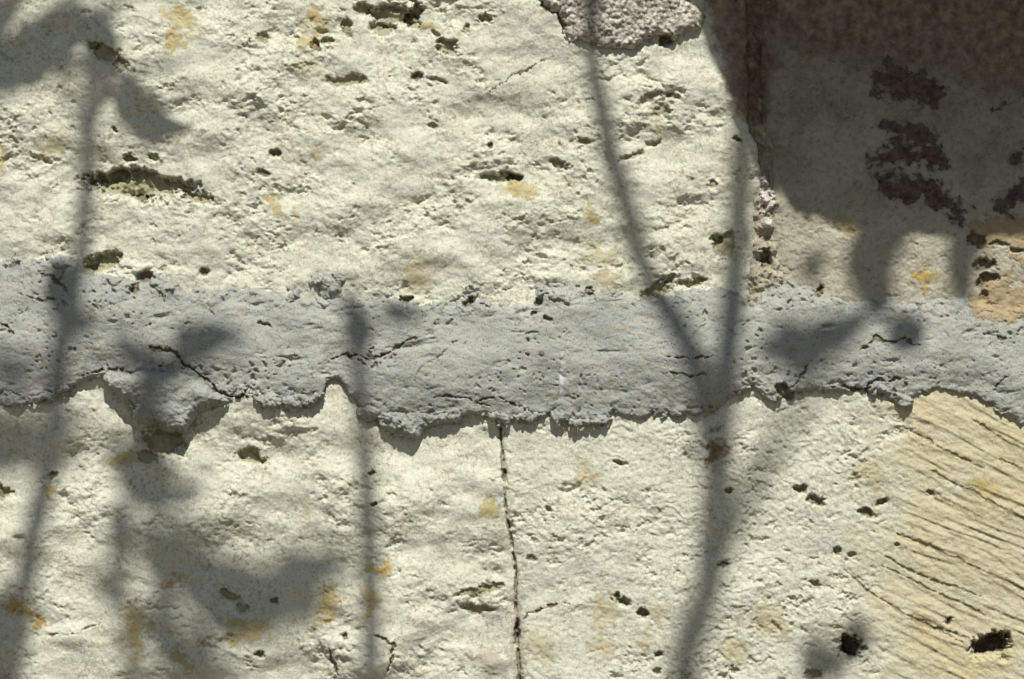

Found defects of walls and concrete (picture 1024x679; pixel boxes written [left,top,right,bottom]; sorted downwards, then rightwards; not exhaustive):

peeling [869,55,947,109]
spalling [865,120,1024,323]
crack [149,346,253,400]
crack [442,393,565,679]